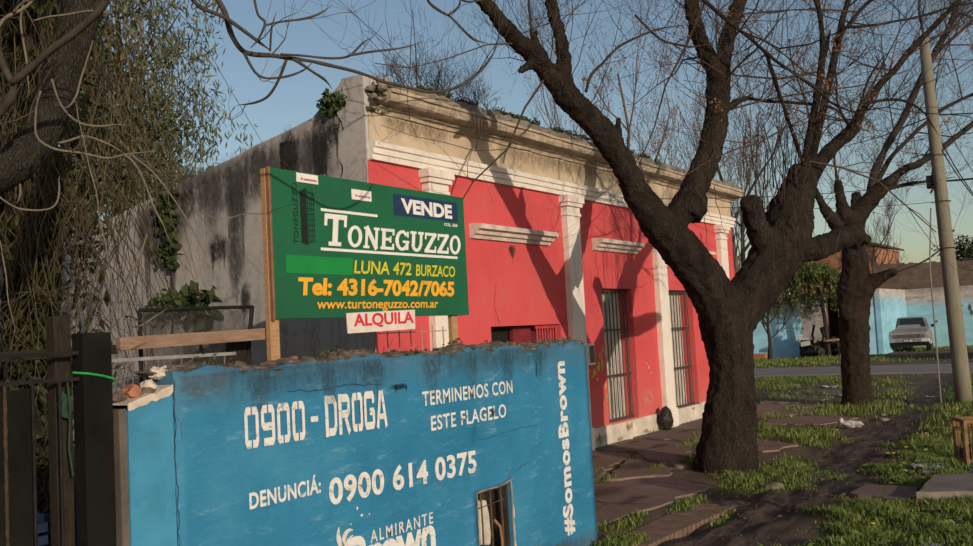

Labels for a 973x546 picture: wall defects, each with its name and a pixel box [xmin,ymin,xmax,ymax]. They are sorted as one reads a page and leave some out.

damp [170,117,340,315]